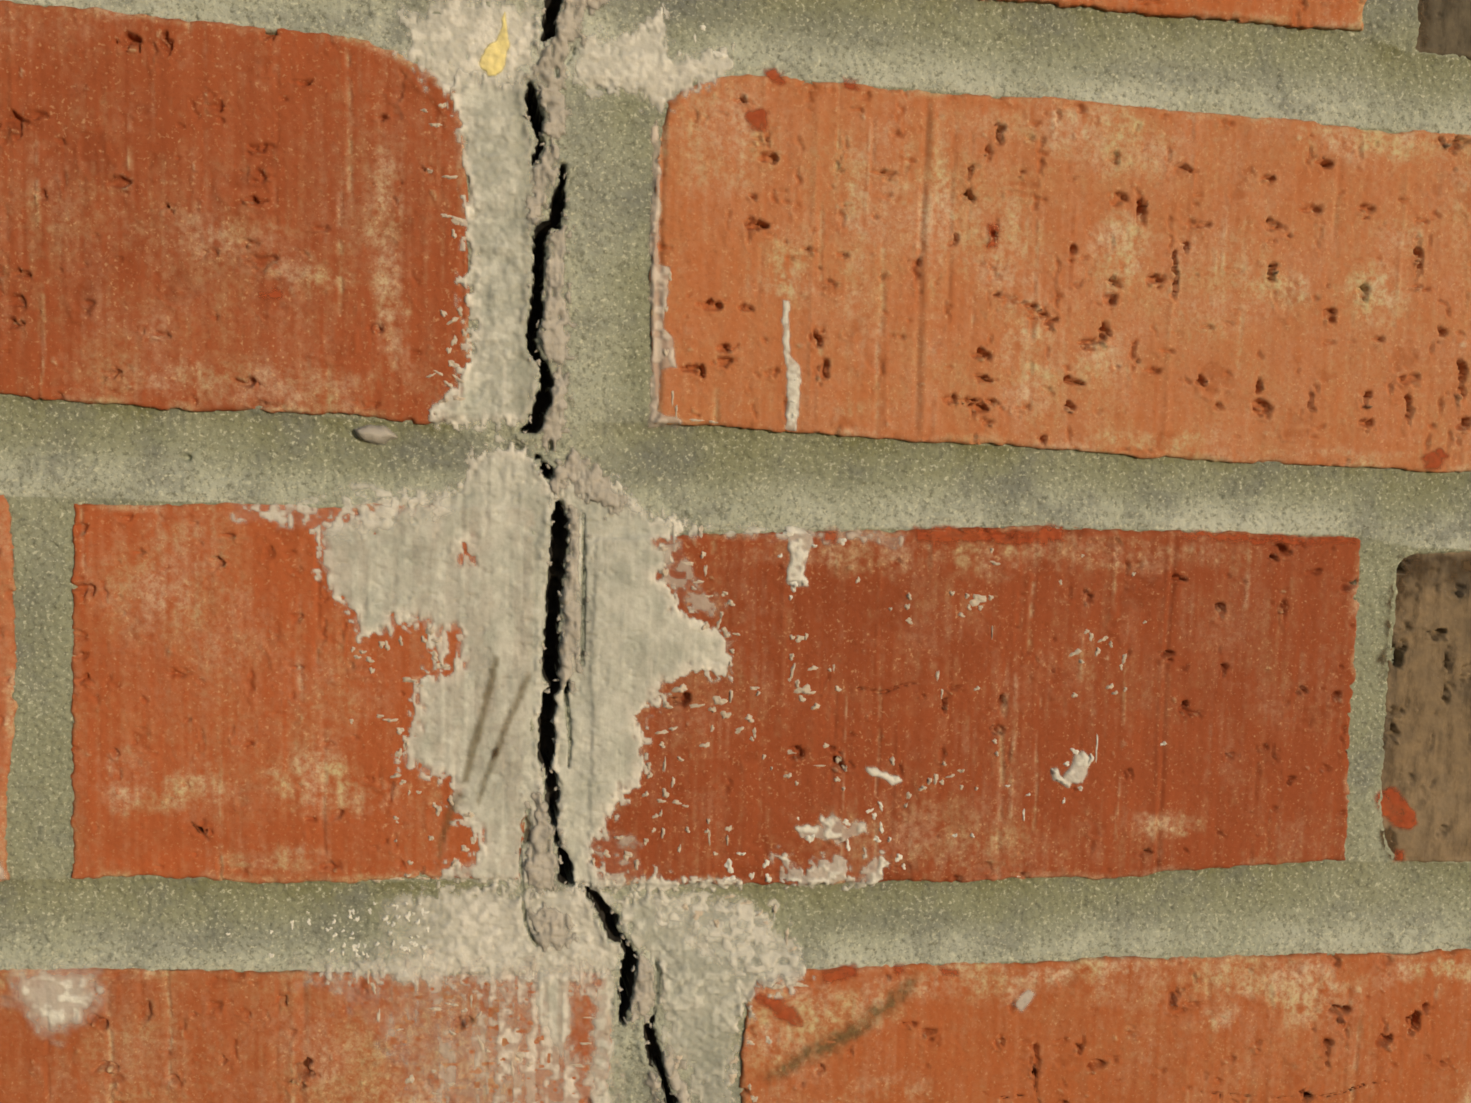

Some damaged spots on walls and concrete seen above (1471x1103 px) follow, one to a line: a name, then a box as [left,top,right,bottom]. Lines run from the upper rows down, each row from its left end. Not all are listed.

crack [519,0,678,1103]